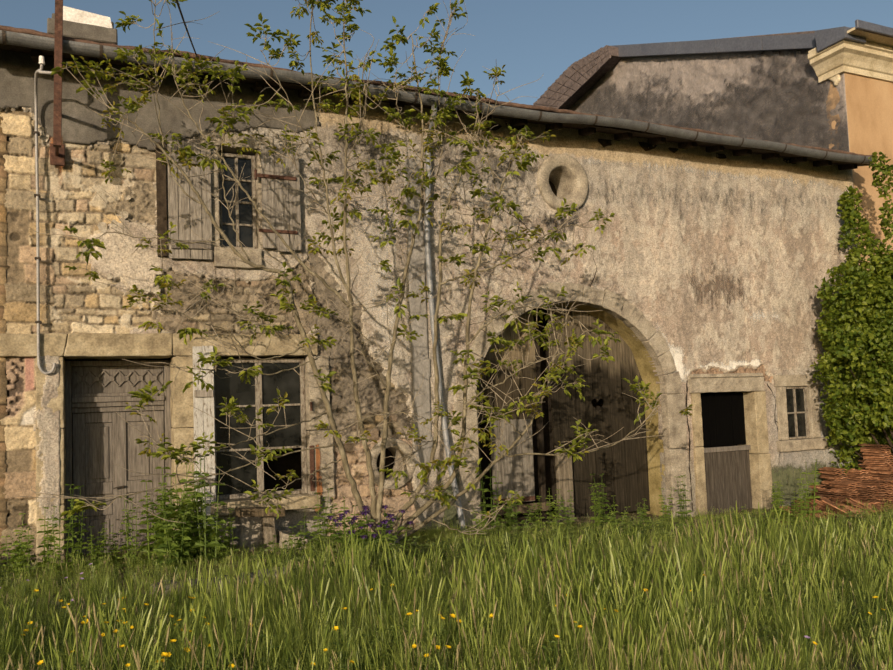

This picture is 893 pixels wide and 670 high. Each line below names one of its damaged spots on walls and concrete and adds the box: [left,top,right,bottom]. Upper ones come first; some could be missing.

leakage [580,49,849,152]
spalling [0,108,419,568]